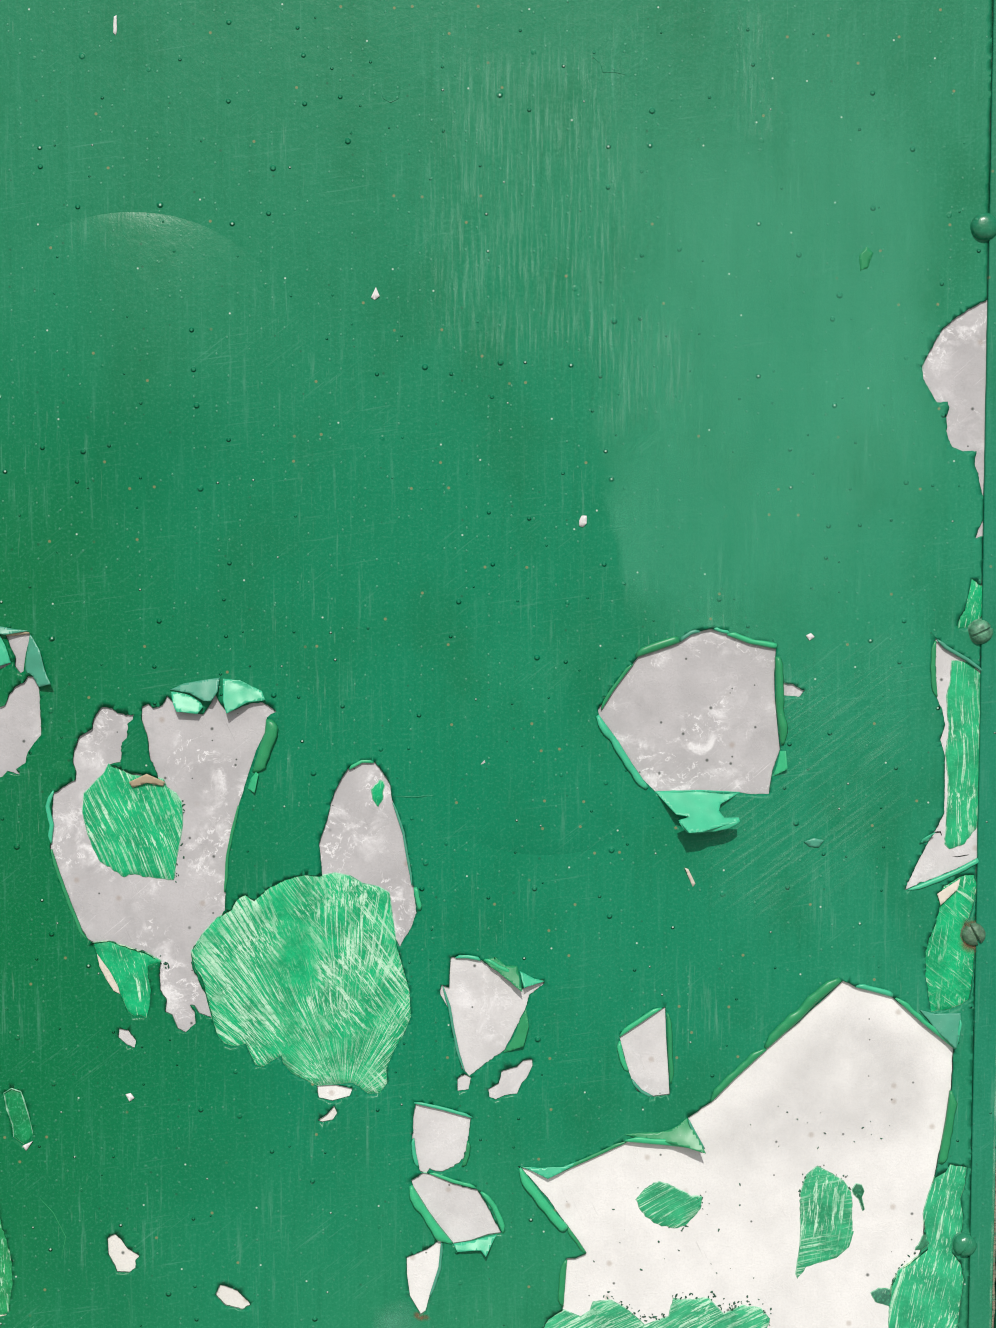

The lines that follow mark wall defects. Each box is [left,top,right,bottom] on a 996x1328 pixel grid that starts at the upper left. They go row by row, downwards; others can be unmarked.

peeling [922,300,987,494]
peeling [0,626,51,777]
peeling [45,677,278,1032]
peeling [319,760,422,946]
peeling [596,627,805,833]
peeling [906,639,982,905]
peeling [119,1029,136,1047]
peeling [440,955,544,1099]
peeling [407,1102,505,1313]
peeling [519,977,962,1328]